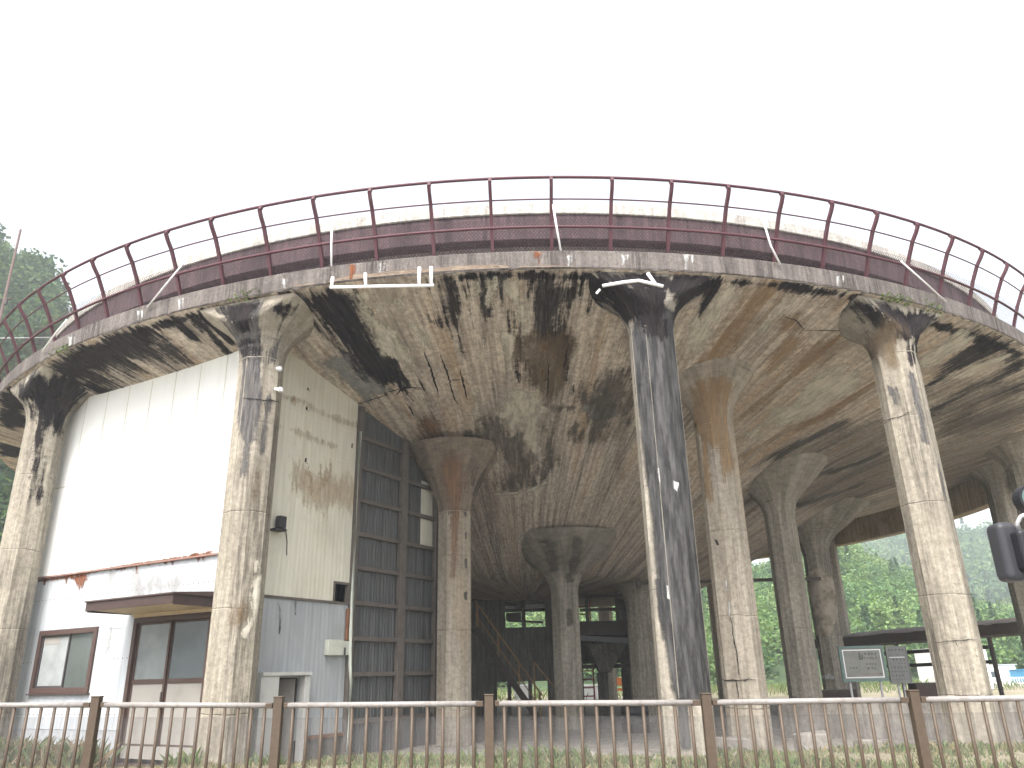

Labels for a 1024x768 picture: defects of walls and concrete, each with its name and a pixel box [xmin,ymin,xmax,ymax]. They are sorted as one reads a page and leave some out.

damp [0,255,660,506]
crack [358,352,467,414]
damp [637,276,1024,501]
corrosion [38,550,215,589]
crack [722,617,753,698]